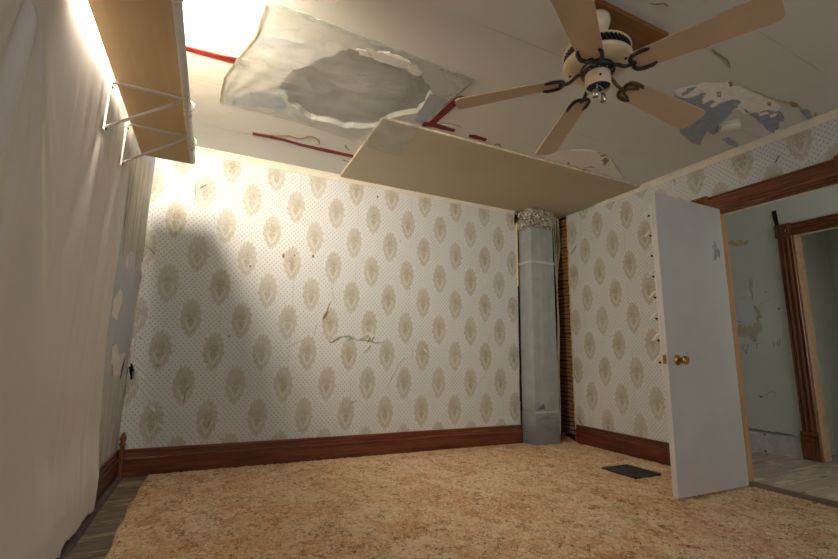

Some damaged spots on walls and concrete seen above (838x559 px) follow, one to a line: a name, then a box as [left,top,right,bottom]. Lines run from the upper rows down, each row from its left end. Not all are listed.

peeling [185,19,318,58]
peeling [674,82,817,147]